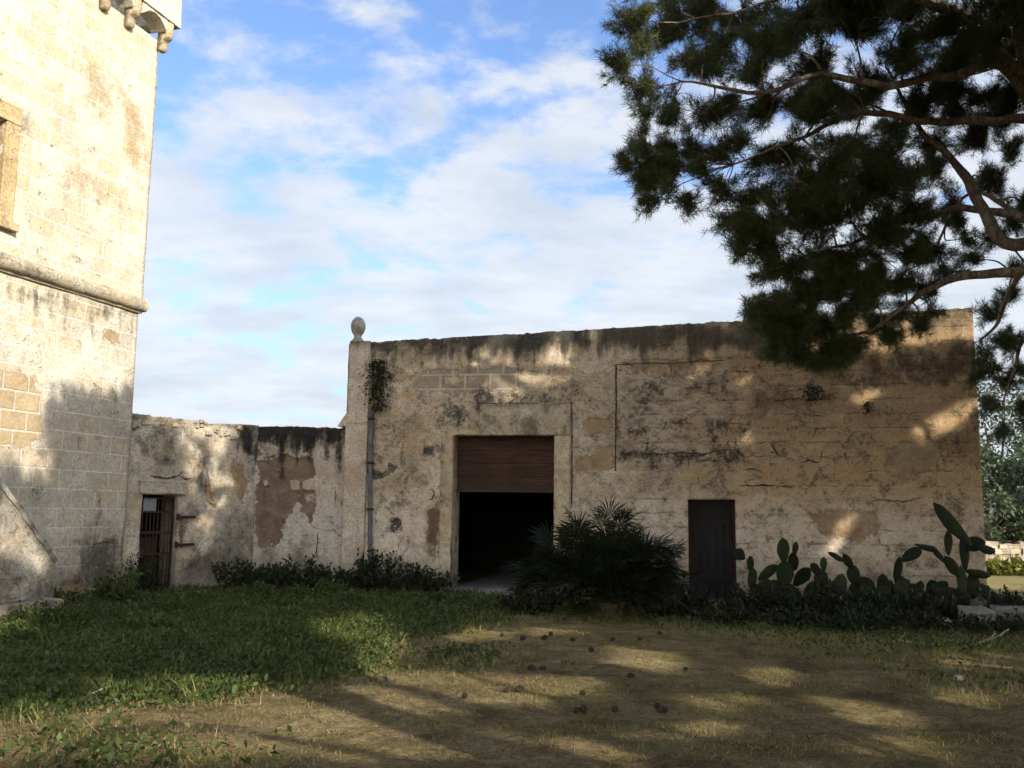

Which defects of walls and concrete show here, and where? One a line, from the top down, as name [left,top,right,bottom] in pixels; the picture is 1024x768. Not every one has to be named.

damp [371,329,589,365]
damp [236,424,345,478]
crack [621,417,823,488]
peeling [231,453,317,548]